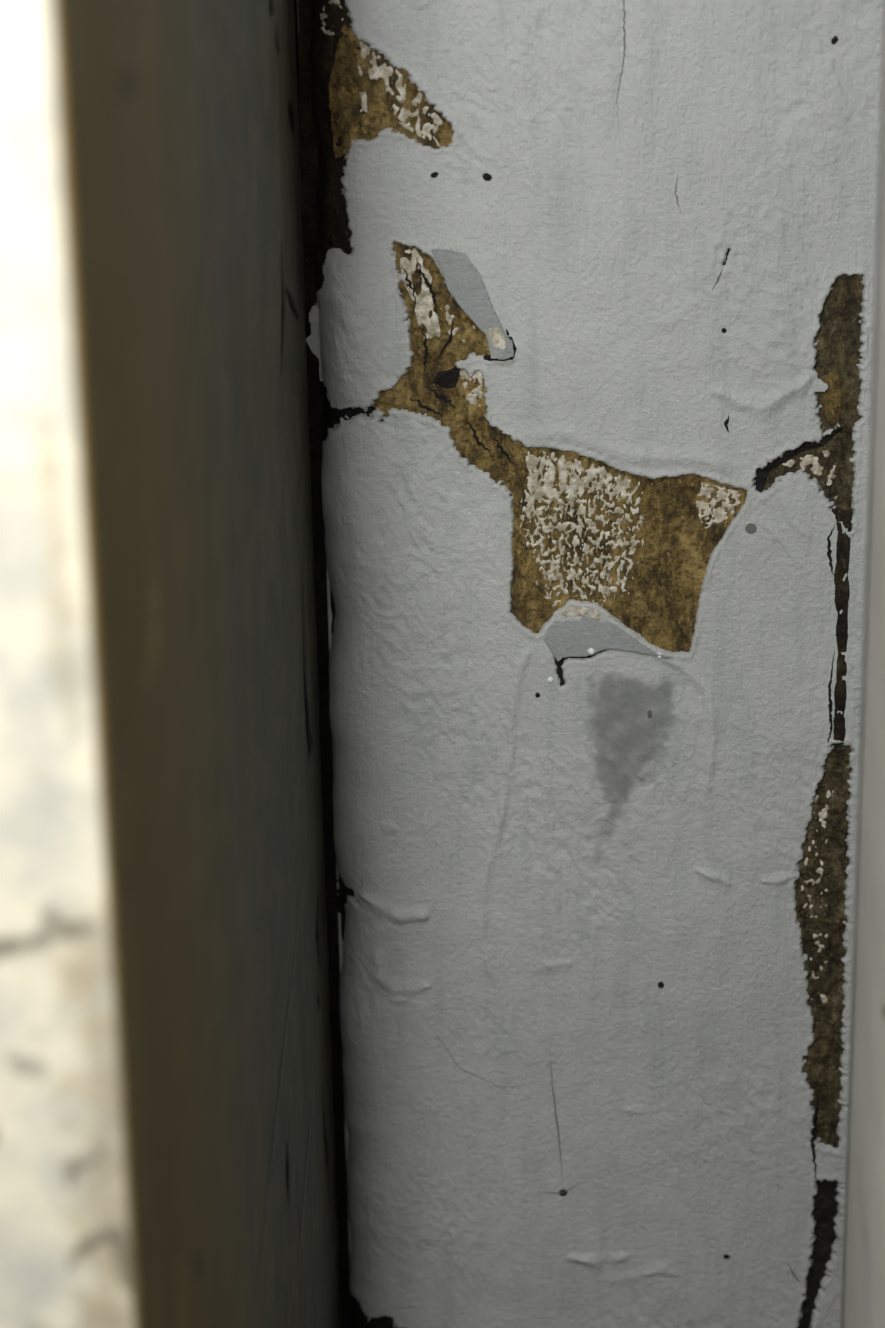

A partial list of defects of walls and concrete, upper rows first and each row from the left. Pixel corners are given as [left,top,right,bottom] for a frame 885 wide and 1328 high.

spalling [297,0,454,334]
peeling [374,241,757,686]
spalling [814,274,864,435]
crack [282,241,397,1328]
spalling [795,743,852,1148]
crack [787,1093,839,1328]